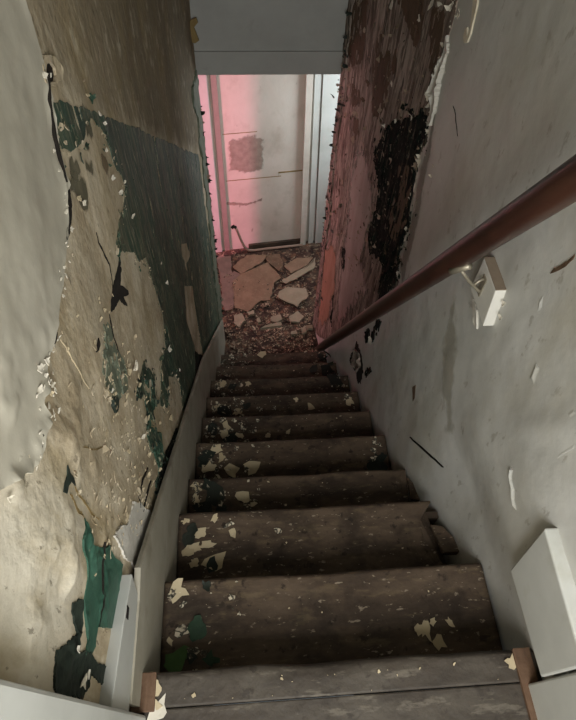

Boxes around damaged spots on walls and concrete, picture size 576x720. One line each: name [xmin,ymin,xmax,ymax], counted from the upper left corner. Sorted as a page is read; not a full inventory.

crack [46,71,72,240]
damp [229,135,263,172]
spalling [313,0,460,340]
crack [96,232,129,355]
peeling [0,0,225,699]
spalling [349,319,382,384]
peeling [192,353,263,507]
crack [409,437,443,468]